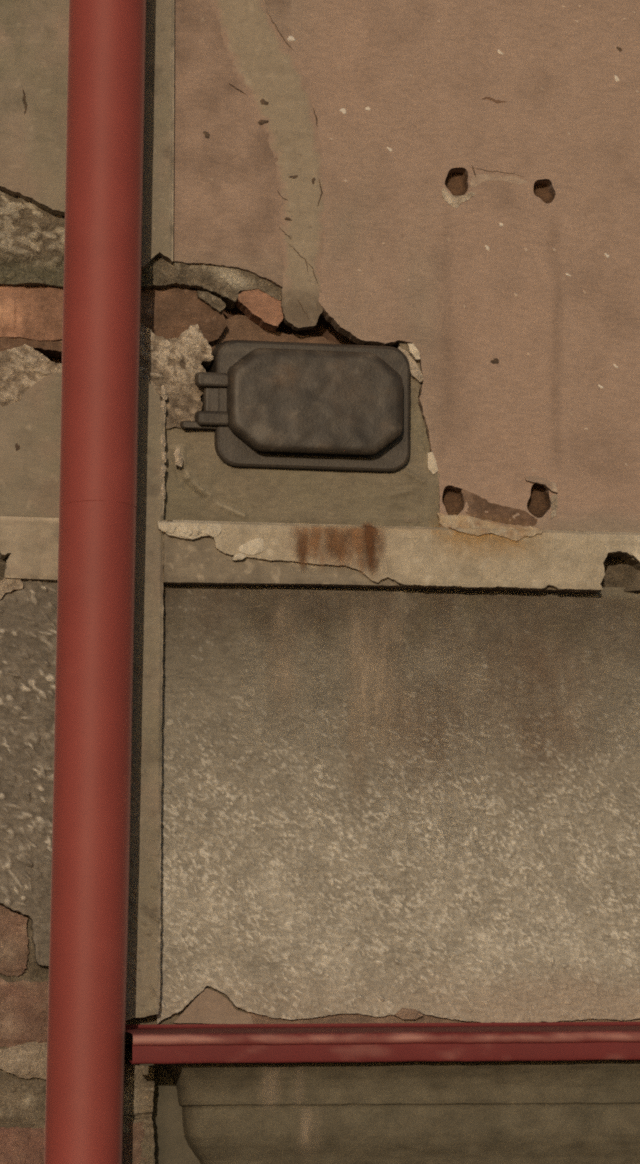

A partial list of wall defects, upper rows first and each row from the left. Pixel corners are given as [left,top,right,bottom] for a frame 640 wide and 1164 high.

spalling [441,188,475,208]
flaking render [0,190,65,407]
flaking render [139,255,339,500]
flaking render [395,342,438,474]
spalling [403,489,558,542]
spalling [0,557,23,600]
peeling [161,520,400,587]
corrosion [298,523,377,569]
spalling [600,552,640,592]
spalling [173,988,494,1024]
flaking render [0,905,49,1164]